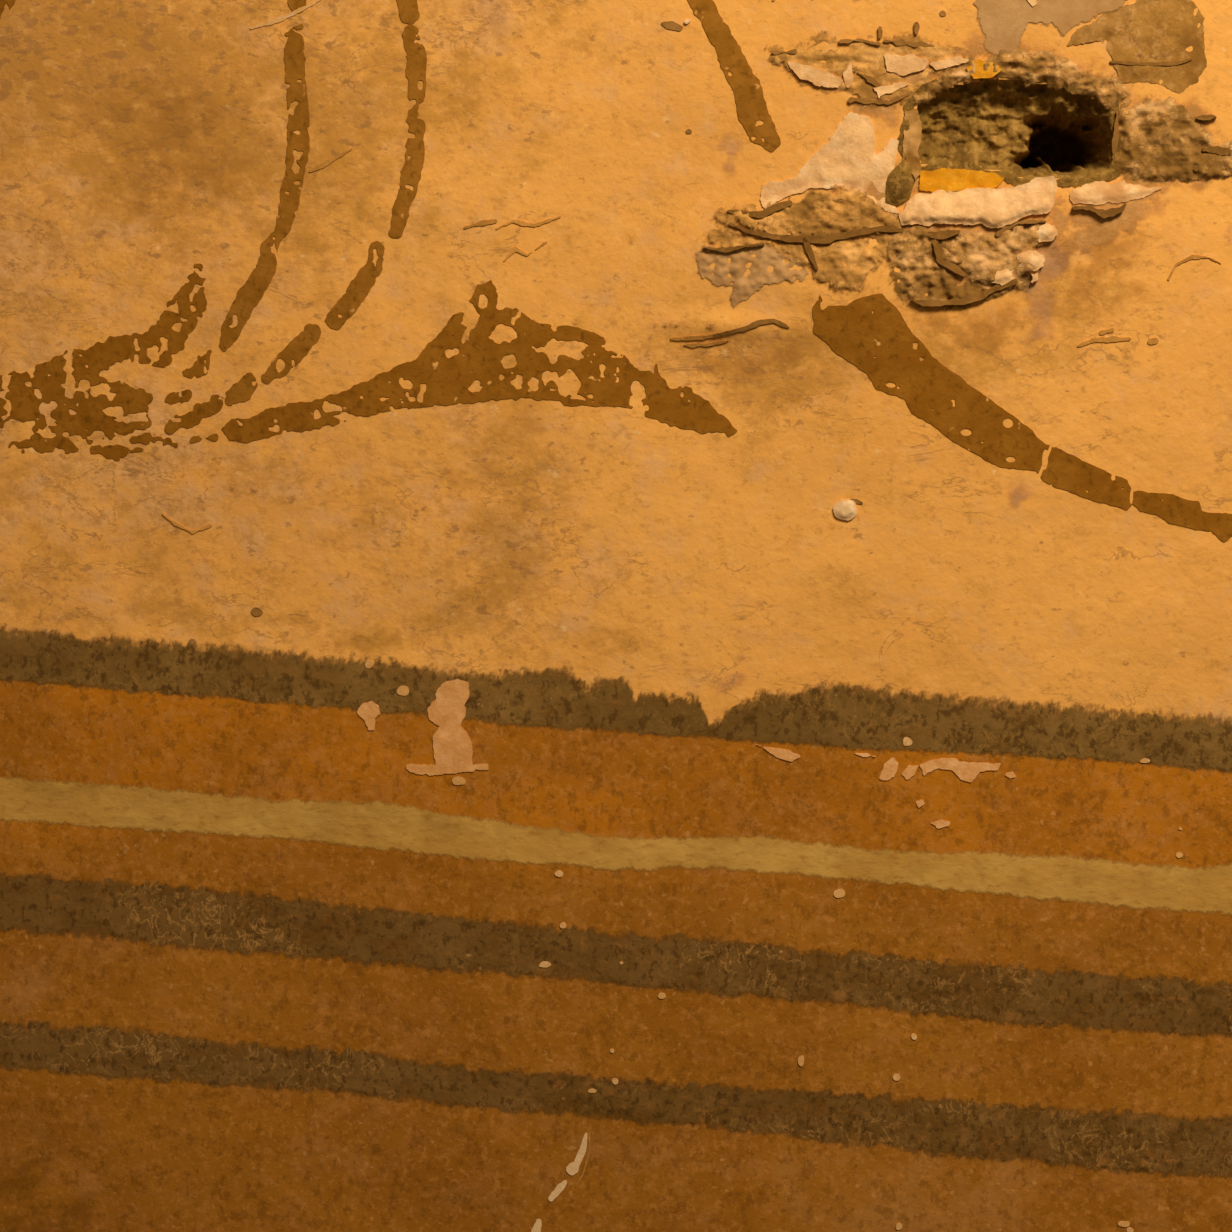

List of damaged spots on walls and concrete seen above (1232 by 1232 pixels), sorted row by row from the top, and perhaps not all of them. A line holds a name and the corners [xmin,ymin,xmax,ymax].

spalling [696,0,1232,310]
peeling [406,679,489,785]
peeling [855,753,1016,782]
peeling [931,819,950,828]